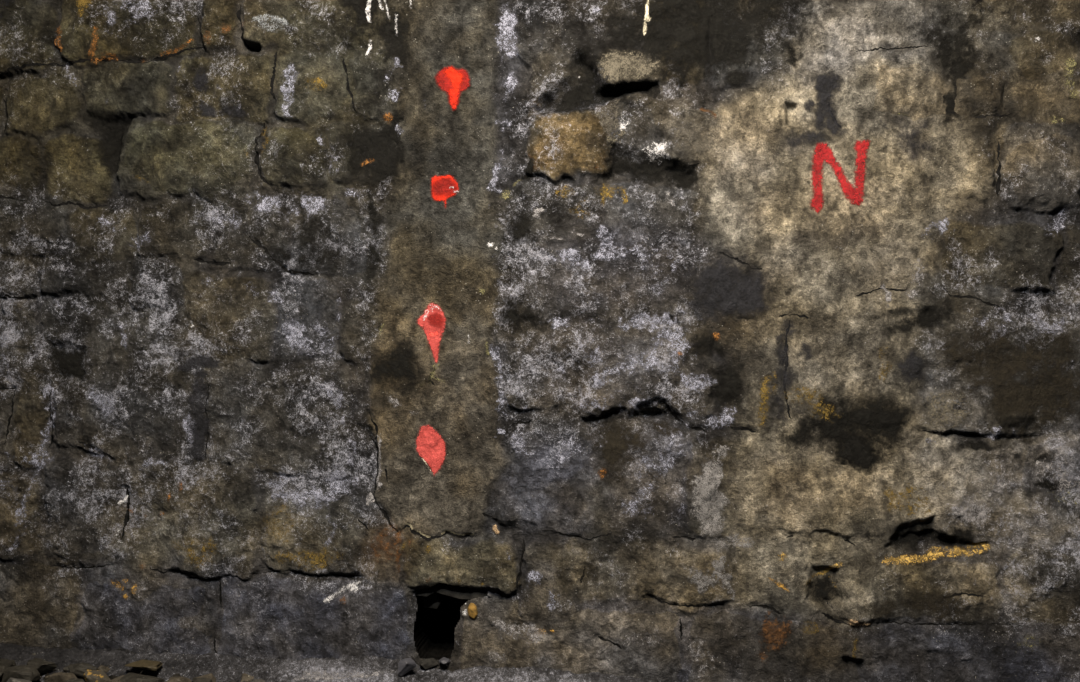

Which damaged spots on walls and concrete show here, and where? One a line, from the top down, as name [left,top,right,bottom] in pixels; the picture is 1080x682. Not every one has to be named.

crack [585,397,705,431]
crack [731,425,756,433]
crack [358,415,496,541]
corrosion [882,543,990,566]